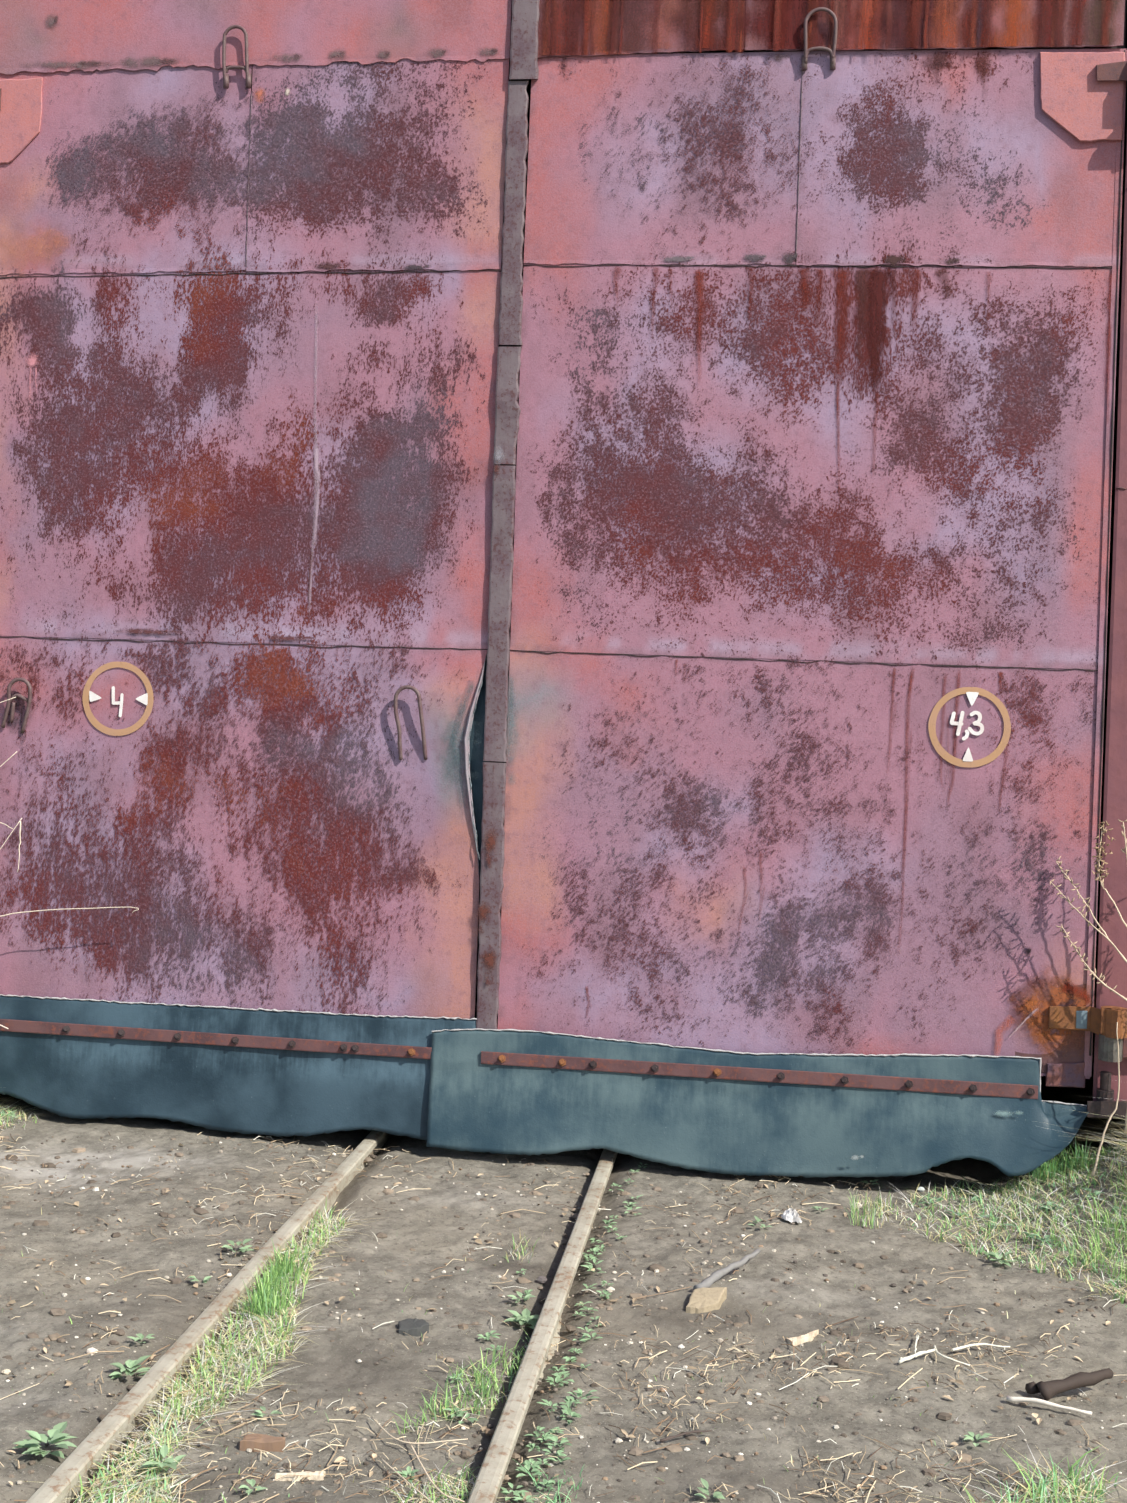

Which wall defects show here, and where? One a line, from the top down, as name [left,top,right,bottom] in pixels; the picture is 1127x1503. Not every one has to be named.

rust [0,60,502,1016]
rust [515,0,1119,1054]